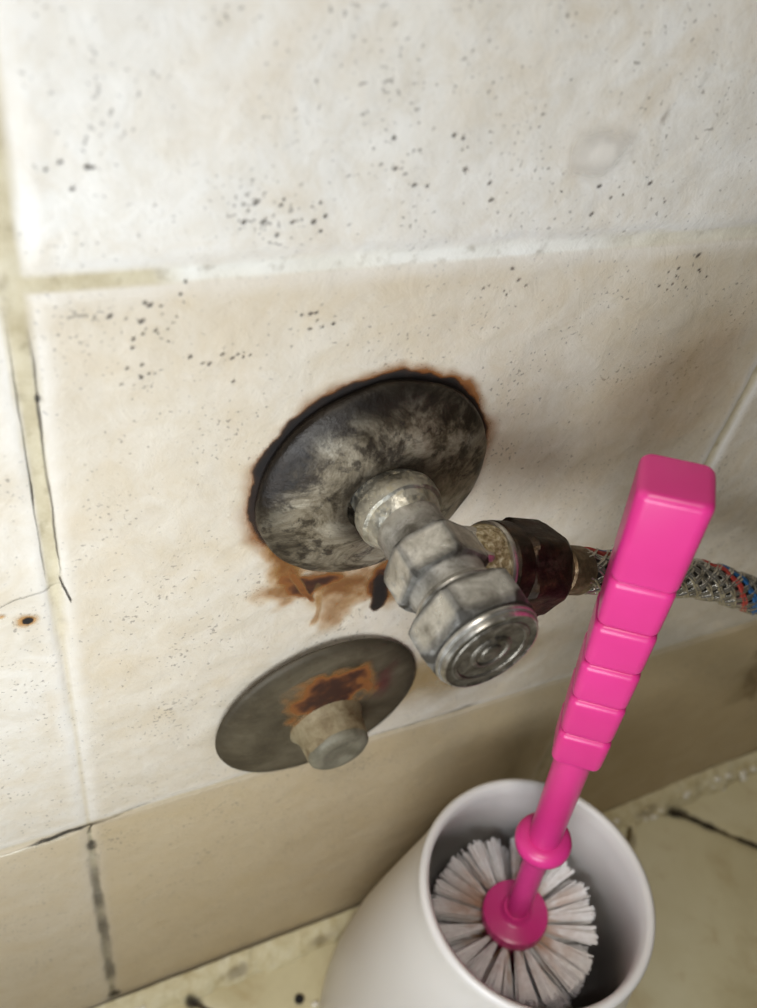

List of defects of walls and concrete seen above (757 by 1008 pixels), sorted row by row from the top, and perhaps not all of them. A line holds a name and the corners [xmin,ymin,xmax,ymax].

crack [10,359,71,602]
corrosion [247,366,491,623]
corrosion [18,616,36,626]
corrosion [287,664,387,726]